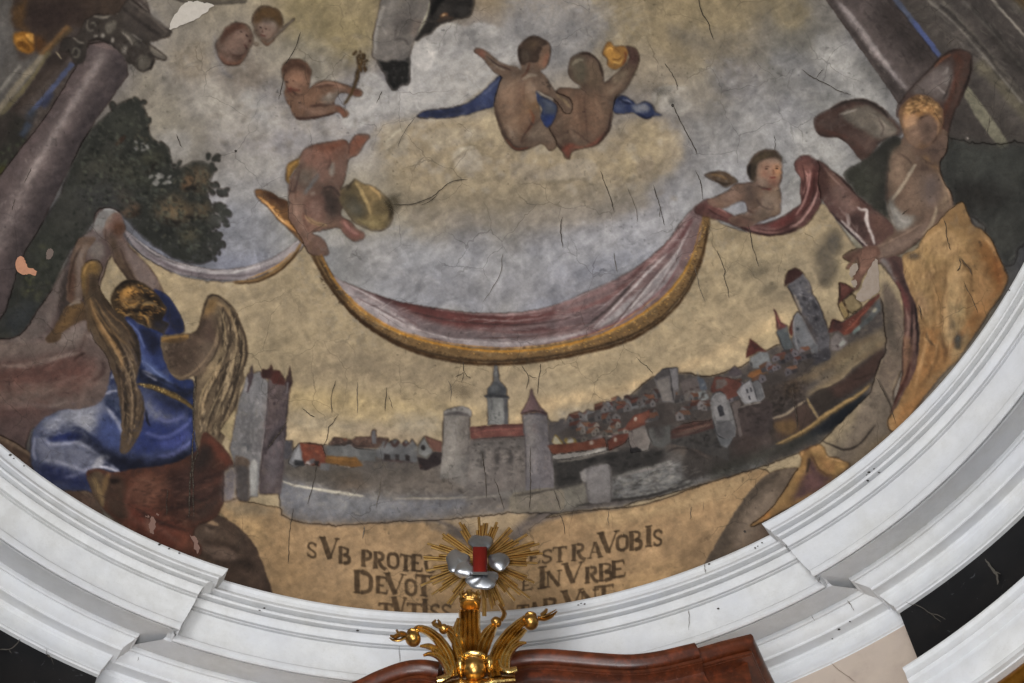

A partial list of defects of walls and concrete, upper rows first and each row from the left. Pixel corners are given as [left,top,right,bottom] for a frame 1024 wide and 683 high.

flaking render [169,1,214,30]
crack [665,64,703,199]
crack [601,173,664,223]
crack [268,382,358,562]
flaking render [145,513,180,554]